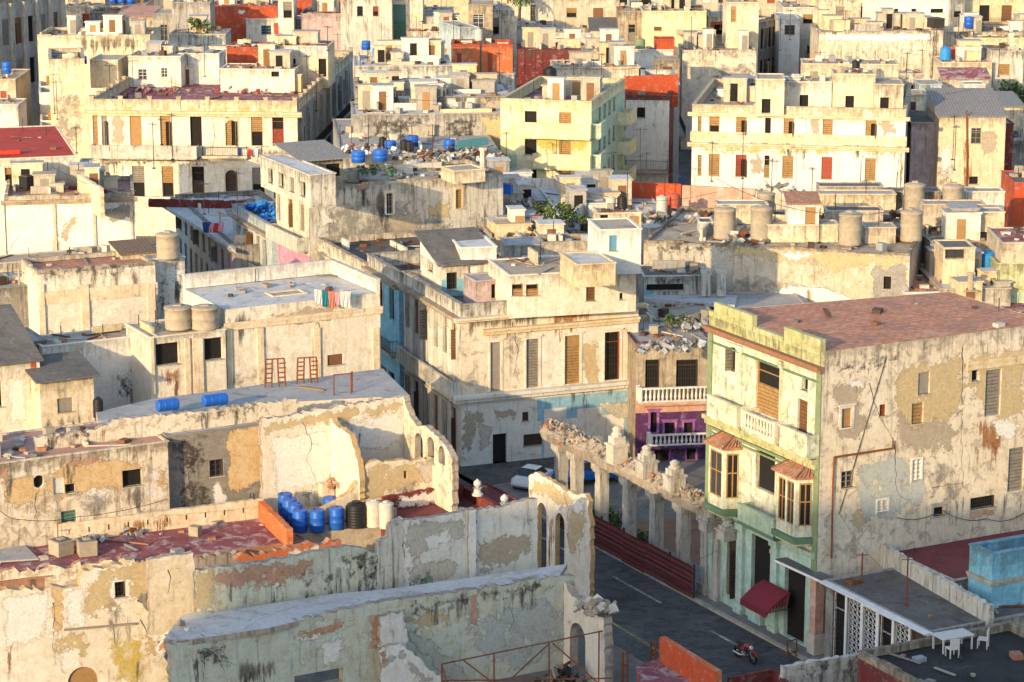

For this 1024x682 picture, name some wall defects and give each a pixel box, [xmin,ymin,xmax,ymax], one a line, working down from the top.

flaking render [981,131,997,156]
flaking render [211,400,404,503]
flaking render [461,410,516,462]
flaking render [849,345,1024,533]
rust [975,423,1001,457]
spalling [0,456,140,507]
flaking render [404,519,465,583]
flaking render [476,534,532,573]
flaking render [1,560,147,674]
water stain [199,641,227,666]
water stain [240,664,271,682]
flaking render [368,608,473,682]